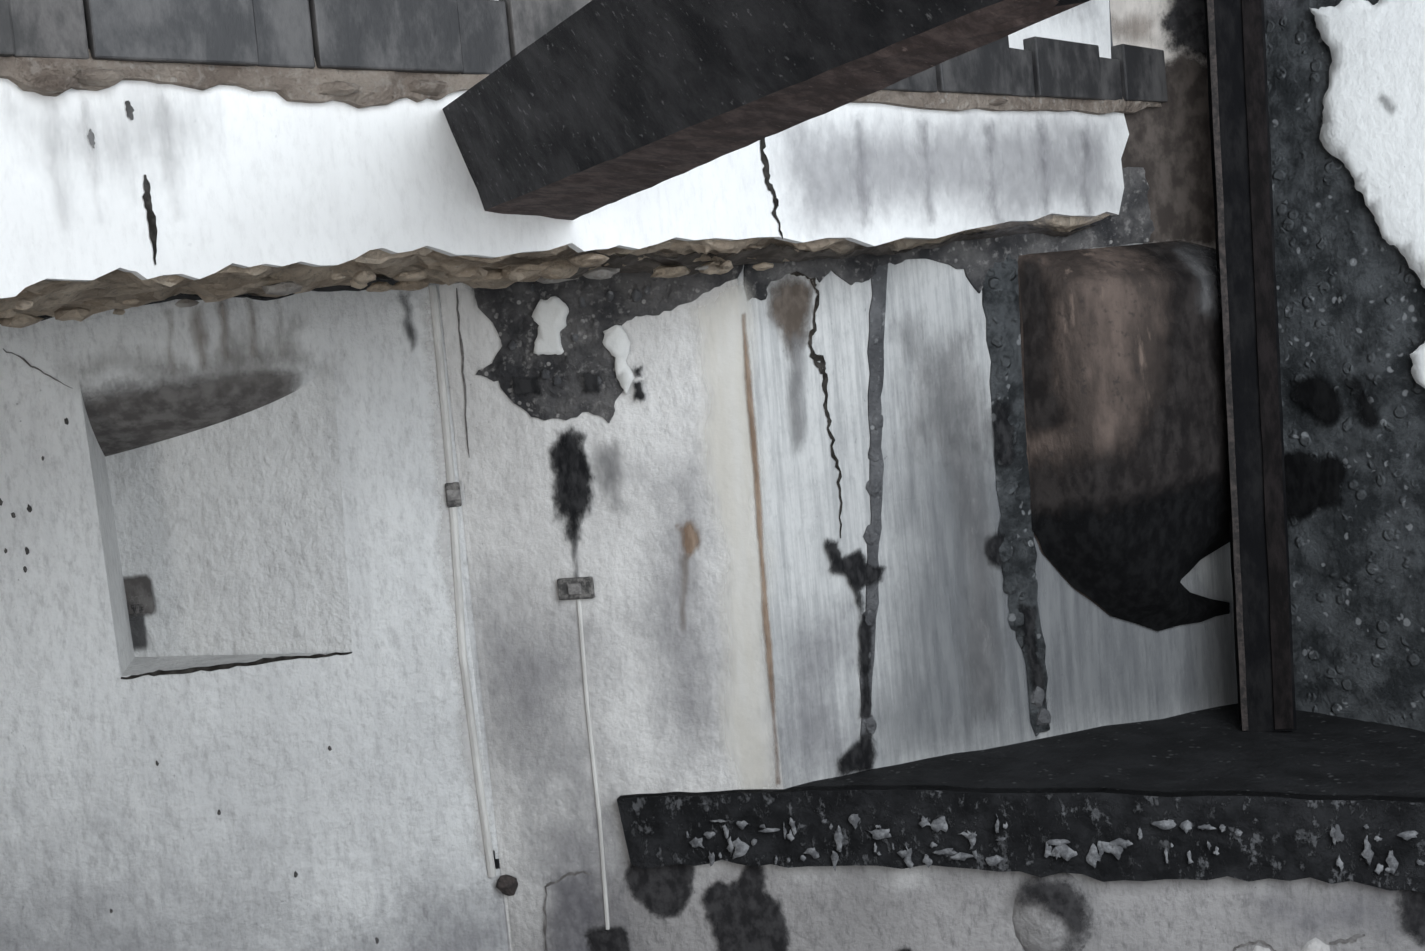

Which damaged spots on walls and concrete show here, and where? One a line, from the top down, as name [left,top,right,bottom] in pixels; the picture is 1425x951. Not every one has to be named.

crack [760,138,783,239]
peeling [1310,0,1425,288]
spalling [0,167,1155,423]
damp [771,279,812,439]
crack [790,271,843,538]
peeling [1410,342,1425,388]
hole [1284,450,1347,518]
rust [682,523,699,564]
damp [1019,602,1046,703]
peeling [1361,824,1418,875]
damp [585,927,630,951]
damp [626,864,790,951]